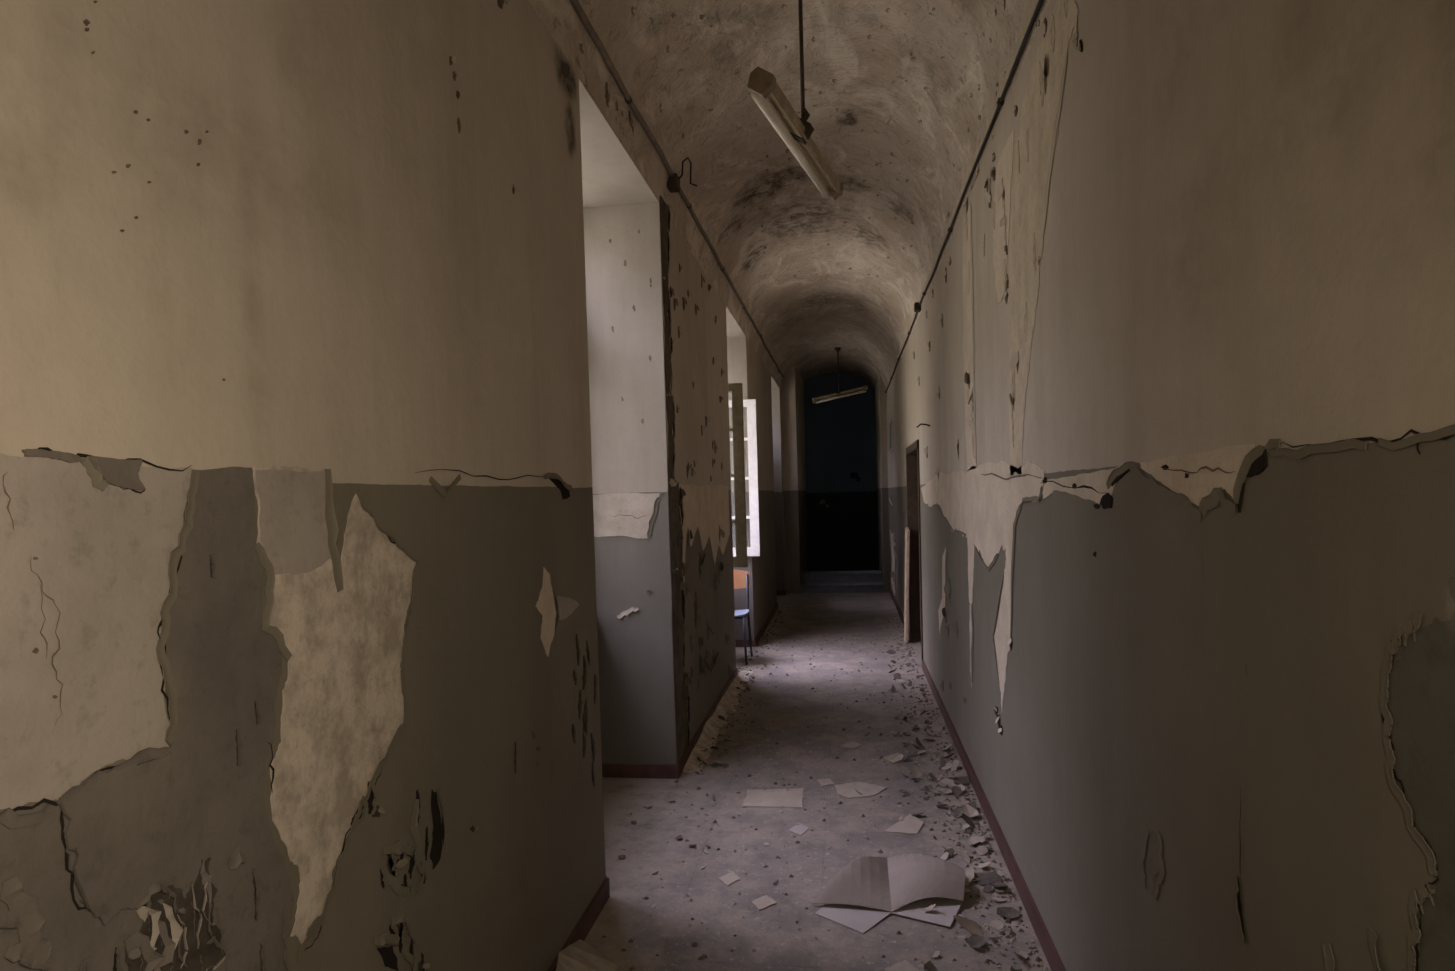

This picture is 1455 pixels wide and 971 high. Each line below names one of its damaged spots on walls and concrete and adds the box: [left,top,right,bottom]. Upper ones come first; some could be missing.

peeling [416,469,572,500]
spalling [593,196,734,763]
peeling [921,0,1280,735]
crack [1269,424,1455,460]
peeling [535,567,580,657]
peeling [0,447,420,971]
peeling [572,633,597,786]
peeling [1379,573,1455,971]
spalling [375,786,448,971]